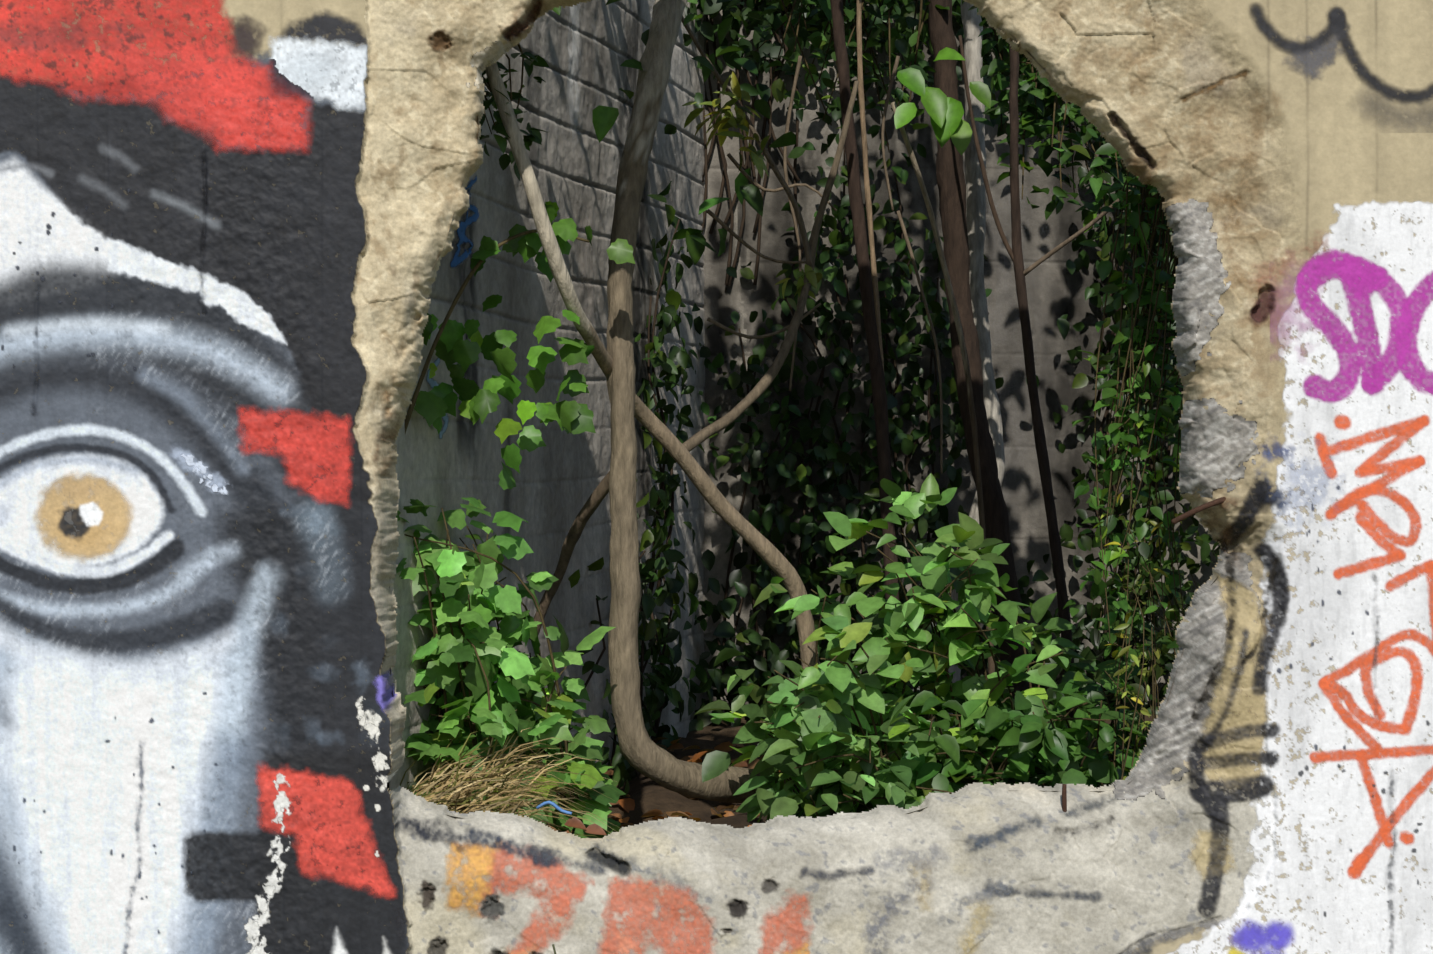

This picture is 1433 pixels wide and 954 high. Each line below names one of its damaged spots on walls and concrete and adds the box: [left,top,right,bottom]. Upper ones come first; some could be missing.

peeling [244,773,291,954]
spalling [351,0,1315,954]